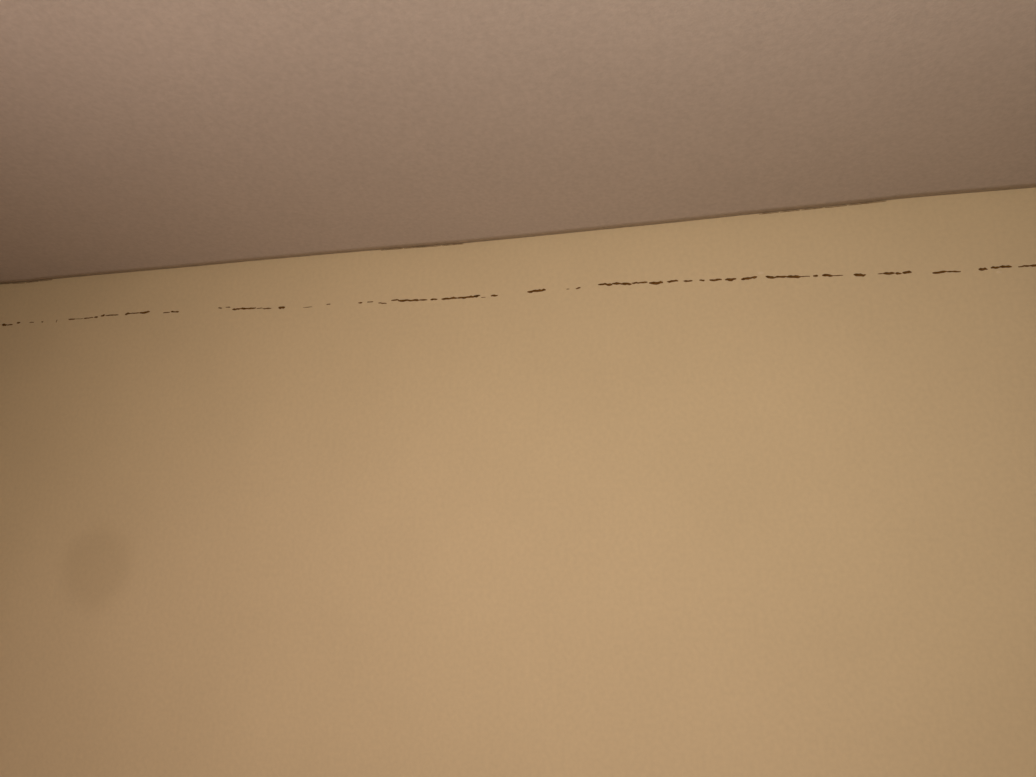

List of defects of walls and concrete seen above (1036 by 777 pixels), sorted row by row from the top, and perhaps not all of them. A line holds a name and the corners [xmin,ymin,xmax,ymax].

crack [576,264,1036,289]
crack [218,303,330,311]
crack [358,295,498,304]
crack [2,311,179,326]